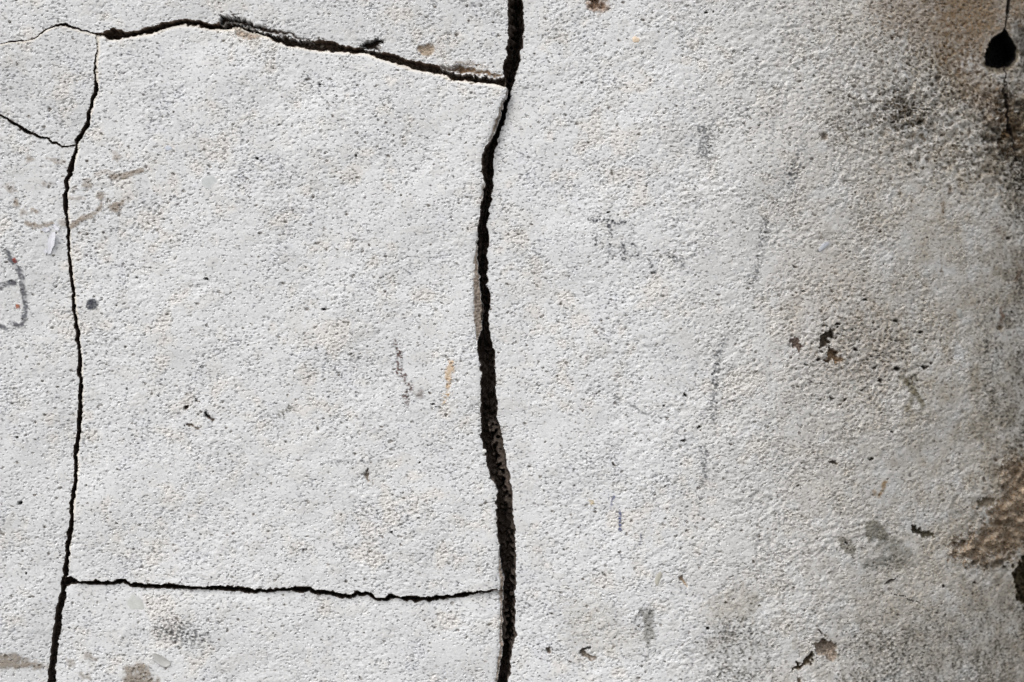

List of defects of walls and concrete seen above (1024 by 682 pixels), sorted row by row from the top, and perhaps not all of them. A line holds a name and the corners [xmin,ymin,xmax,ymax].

crack [1003,0,1011,29]
crack [1001,66,1020,163]
crack [0,0,525,682]